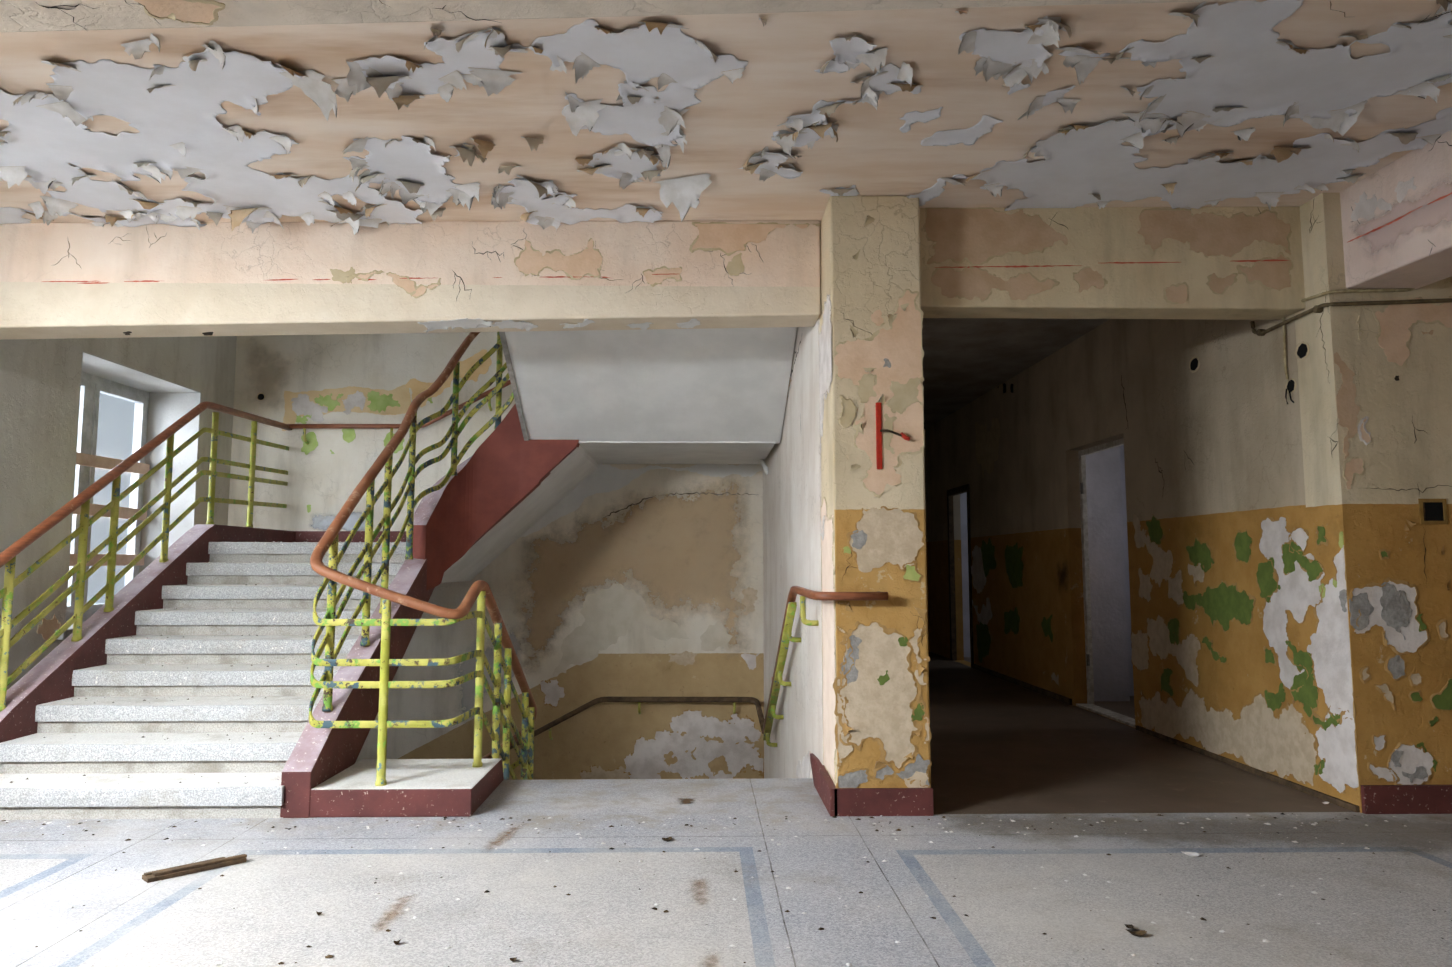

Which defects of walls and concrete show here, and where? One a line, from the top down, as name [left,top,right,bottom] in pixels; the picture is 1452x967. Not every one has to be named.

peeling [0,0,820,287]
peeling [738,0,1452,295]
peeling [282,349,492,431]
peeling [418,318,538,333]
peeling [540,680,565,708]
peeling [580,709,764,779]
peeling [796,289,932,788]
peeling [1131,515,1450,804]